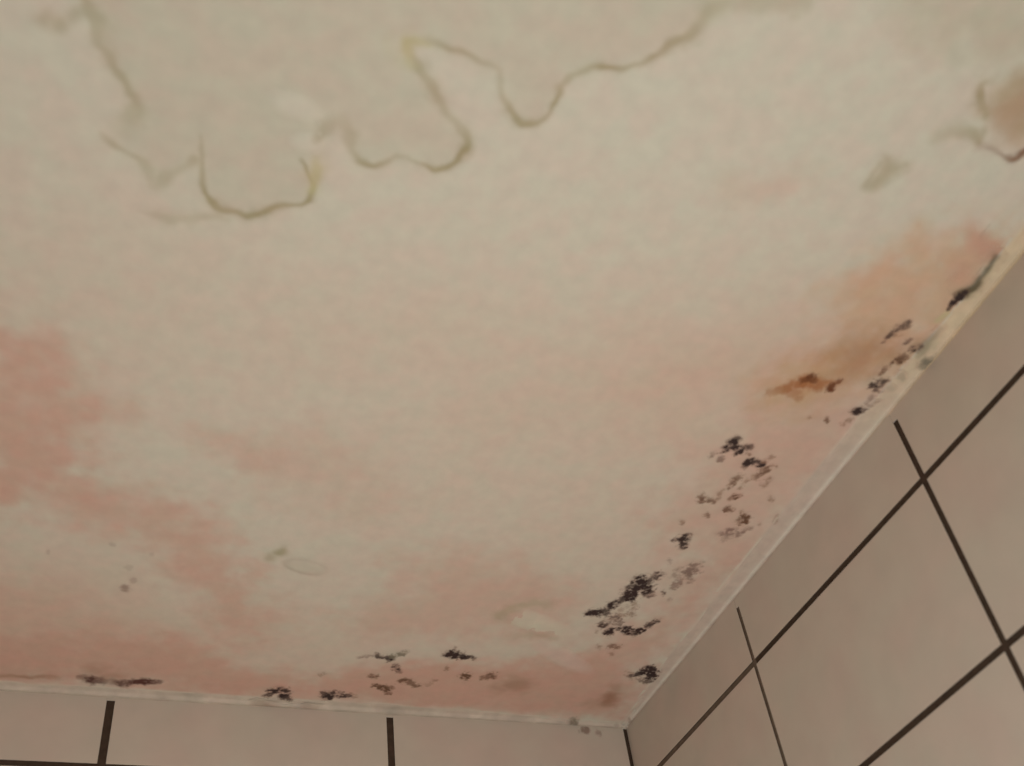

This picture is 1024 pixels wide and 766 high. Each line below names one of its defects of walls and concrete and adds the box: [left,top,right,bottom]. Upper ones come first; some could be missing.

damp [27,0,819,230]
damp [872,0,1024,167]
damp [0,194,1024,738]
rust [729,314,927,428]